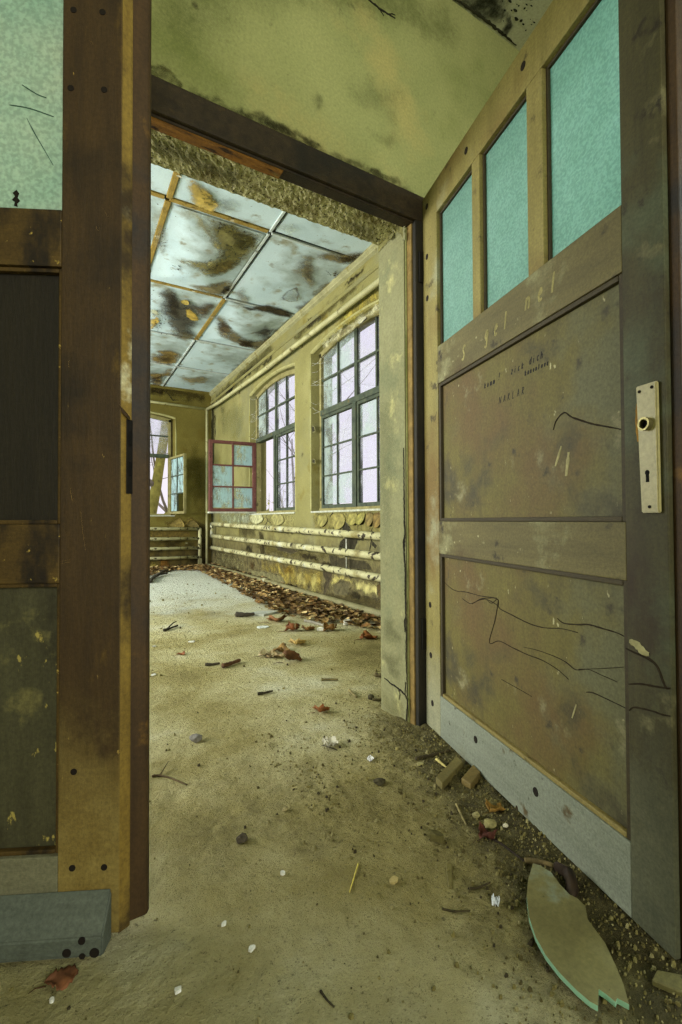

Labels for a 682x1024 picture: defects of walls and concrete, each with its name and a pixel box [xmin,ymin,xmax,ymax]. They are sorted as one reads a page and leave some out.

leakage [454,0,535,46]
leakage [325,305,377,347]
leakage [150,217,363,498]
crack [553,412,621,430]
leakage [328,575,381,608]
crack [444,582,671,717]